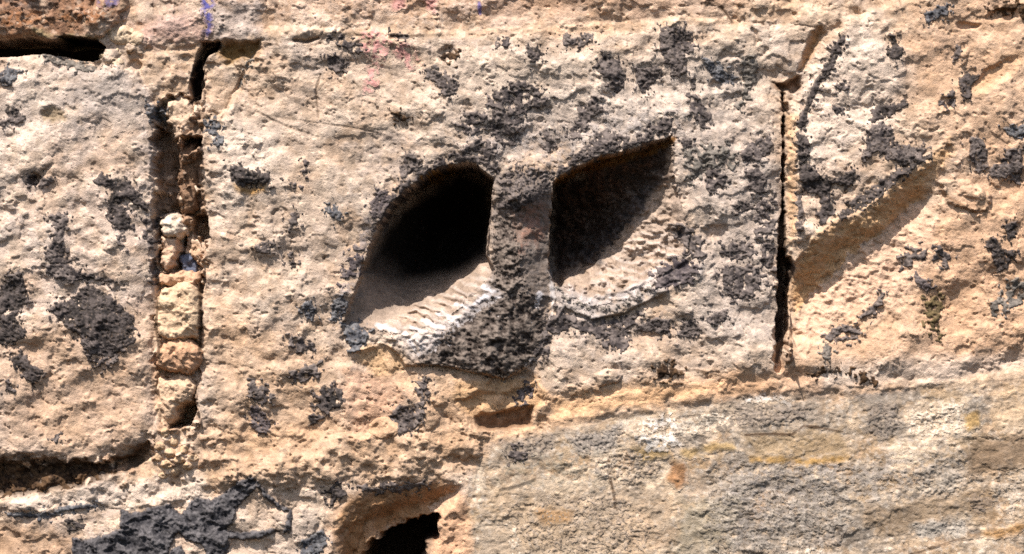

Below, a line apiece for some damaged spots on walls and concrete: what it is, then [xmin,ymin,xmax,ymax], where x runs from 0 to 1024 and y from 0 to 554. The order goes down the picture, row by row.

crack [187,41,223,106]
crack [774,92,798,364]